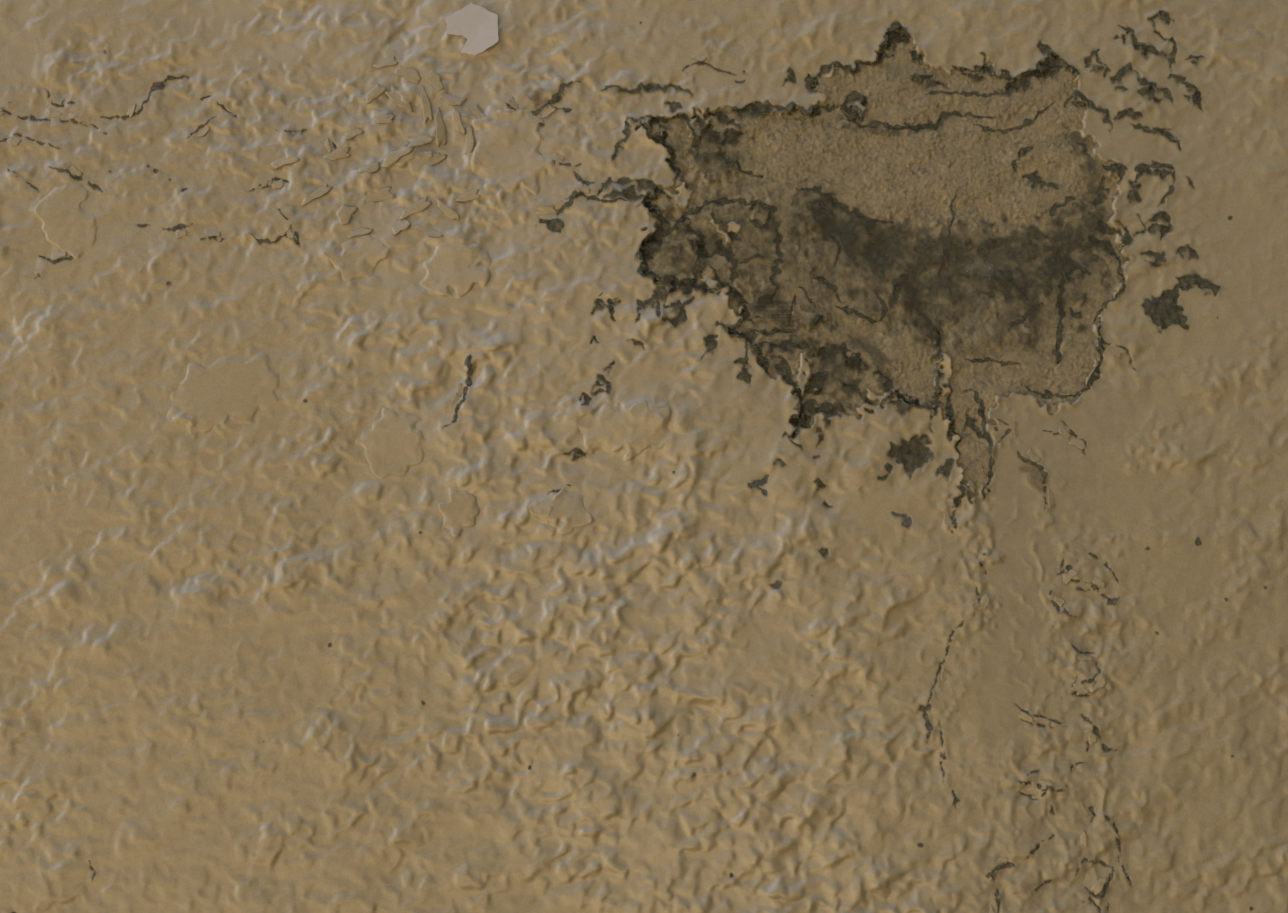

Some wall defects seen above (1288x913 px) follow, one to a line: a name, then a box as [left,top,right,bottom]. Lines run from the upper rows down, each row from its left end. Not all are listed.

crack [0,75,237,192]
crack [276,129,336,153]
crack [24,251,74,279]
crack [138,177,300,246]
peeling [540,219,564,233]
peeling [564,10,1204,507]
leakage [791,189,1120,347]
peeling [1142,274,1220,332]
crack [943,506,957,533]
crack [920,562,990,808]
crack [987,552,1131,913]